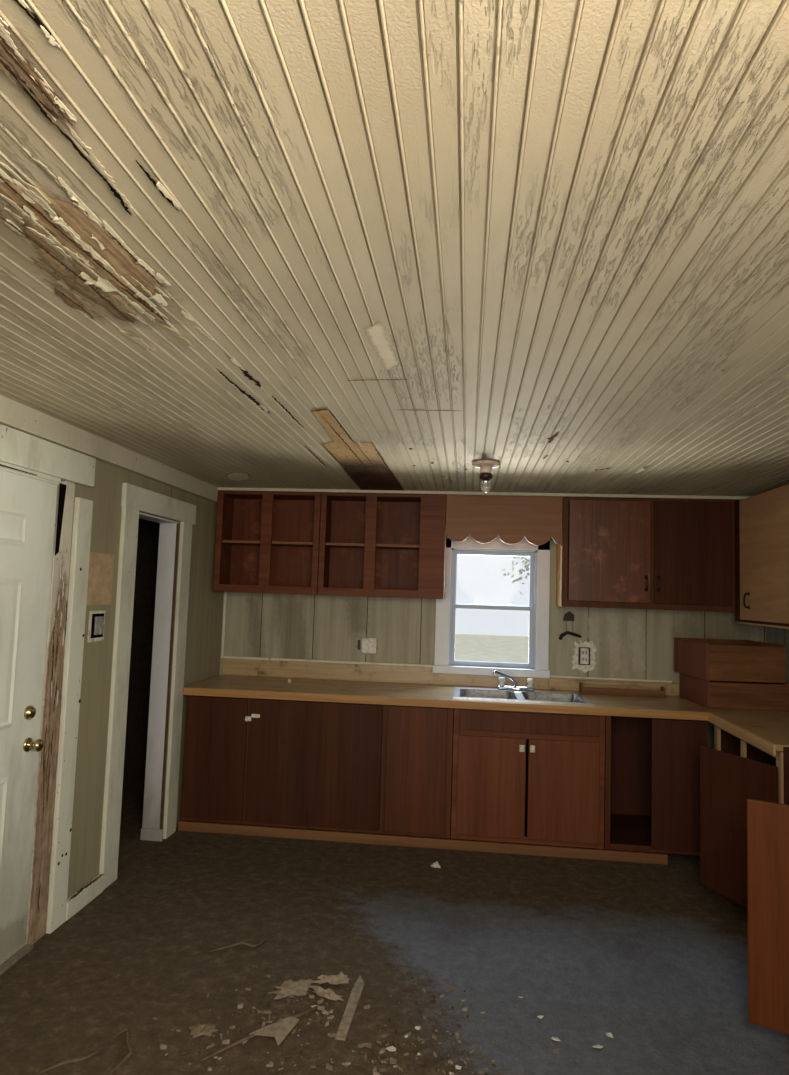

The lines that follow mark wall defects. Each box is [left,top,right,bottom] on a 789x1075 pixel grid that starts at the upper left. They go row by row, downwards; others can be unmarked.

crack [15,0,61,50]
peeling [0,18,136,216]
peeling [0,160,214,351]
peeling [216,357,304,428]
peeling [305,409,404,494]